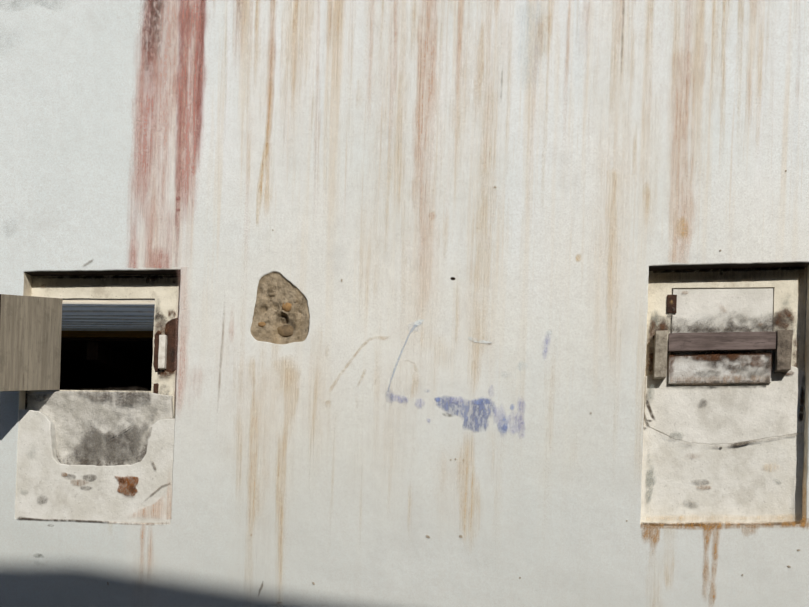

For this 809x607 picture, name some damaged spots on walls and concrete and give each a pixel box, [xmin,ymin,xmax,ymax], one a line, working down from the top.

corrosion [141,0,204,220]
spalling [250,272,310,344]
damp [651,315,786,332]
crack [716,440,756,449]
corrosion [115,476,138,496]
corrosion [644,523,740,572]